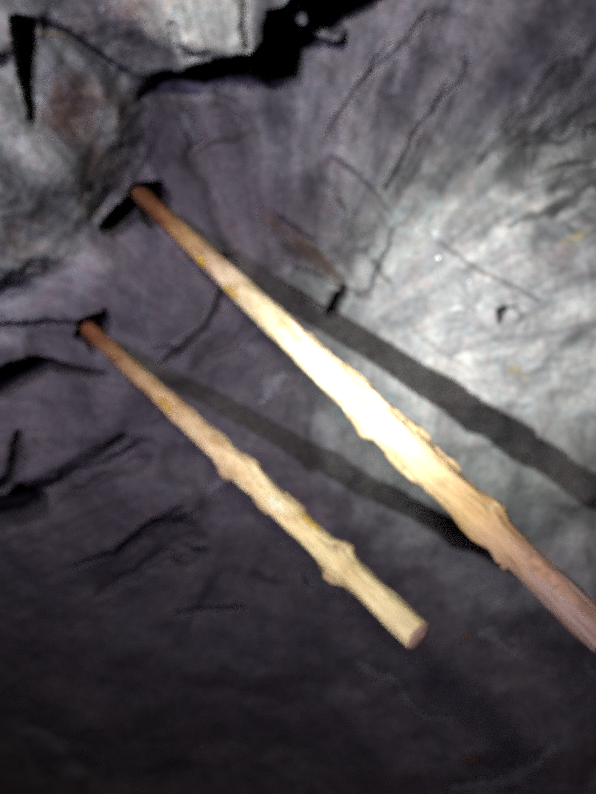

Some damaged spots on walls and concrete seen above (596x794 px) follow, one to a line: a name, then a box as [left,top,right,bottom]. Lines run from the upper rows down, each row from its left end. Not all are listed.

crack [17,15,112,113]
crack [239,0,332,65]
crack [0,354,96,384]
crack [0,433,124,512]